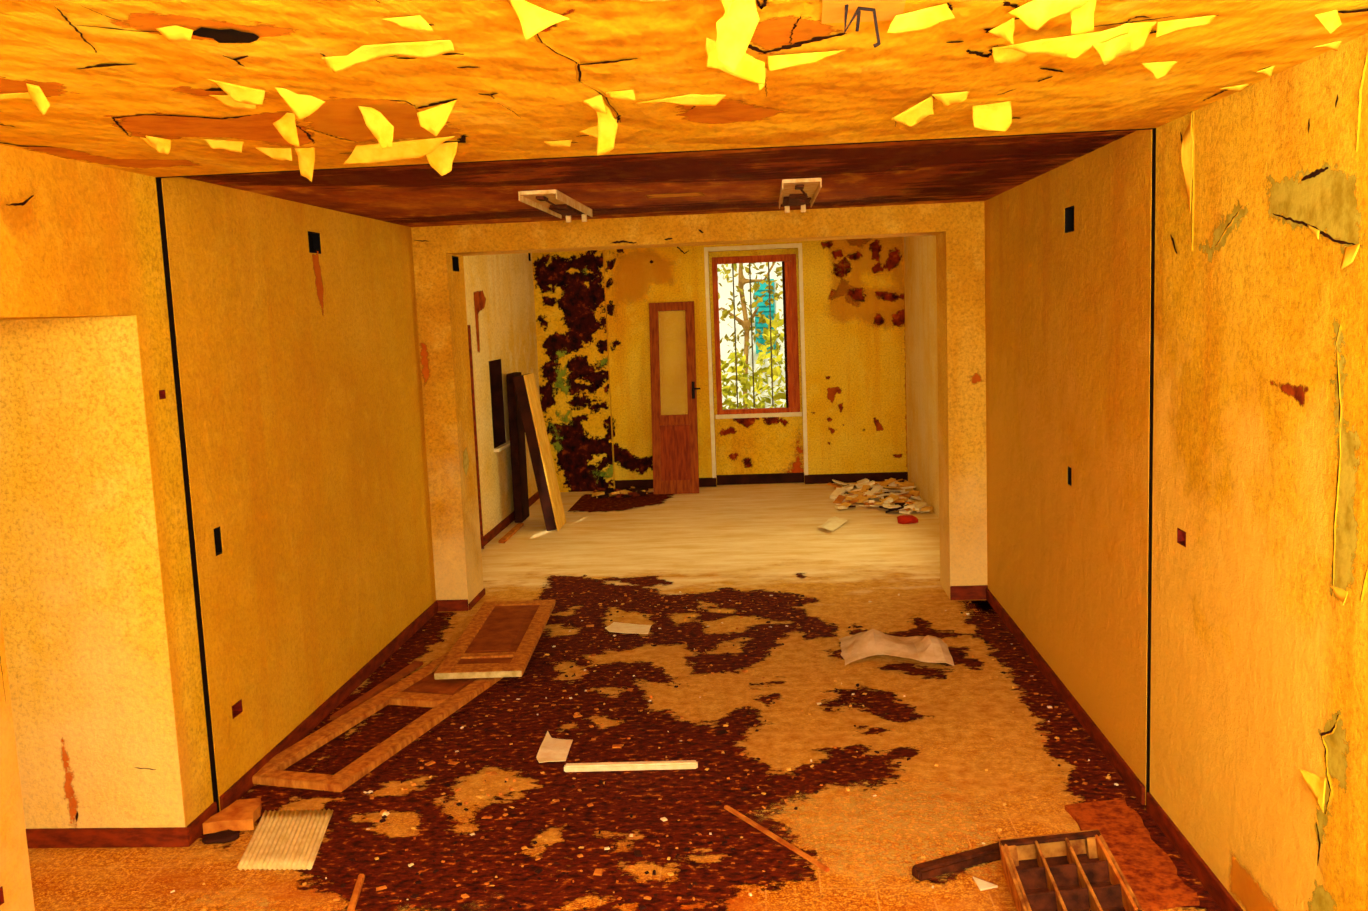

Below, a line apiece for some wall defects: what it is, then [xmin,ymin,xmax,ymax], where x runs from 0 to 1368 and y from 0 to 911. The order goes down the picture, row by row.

peeling [0,77,468,182]
peeling [321,0,464,73]
crack [507,0,638,139]
peeling [545,0,846,156]
peeling [887,3,955,34]
peeling [891,91,1020,131]
peeling [946,0,1218,79]
crack [1308,49,1368,151]
peeling [1265,159,1365,270]
corrosion [785,440,804,473]
crack [1360,566,1368,603]
peeling [1298,710,1350,911]